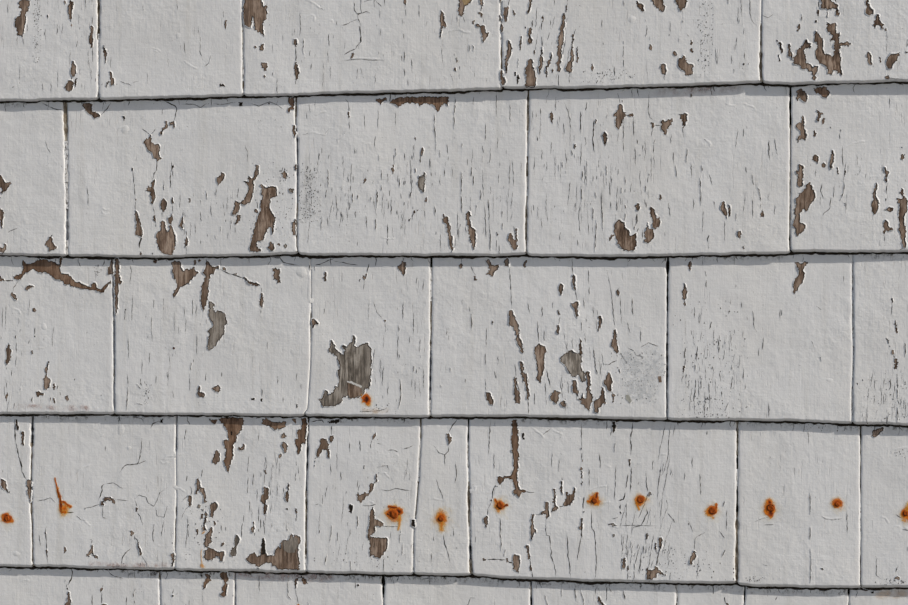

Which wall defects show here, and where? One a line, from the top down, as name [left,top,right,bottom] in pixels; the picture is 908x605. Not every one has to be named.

peeling [231,164,297,253]
peeling [131,130,264,351]
peeling [0,235,126,316]
peeling [318,334,373,408]
peeling [208,416,246,473]
corrosion [54,478,72,515]
peeling [182,457,308,601]
corrosion [385,505,403,530]
corrosion [494,498,508,512]
corrosion [587,492,601,506]
corrosion [705,503,718,519]
corrosion [764,498,776,519]